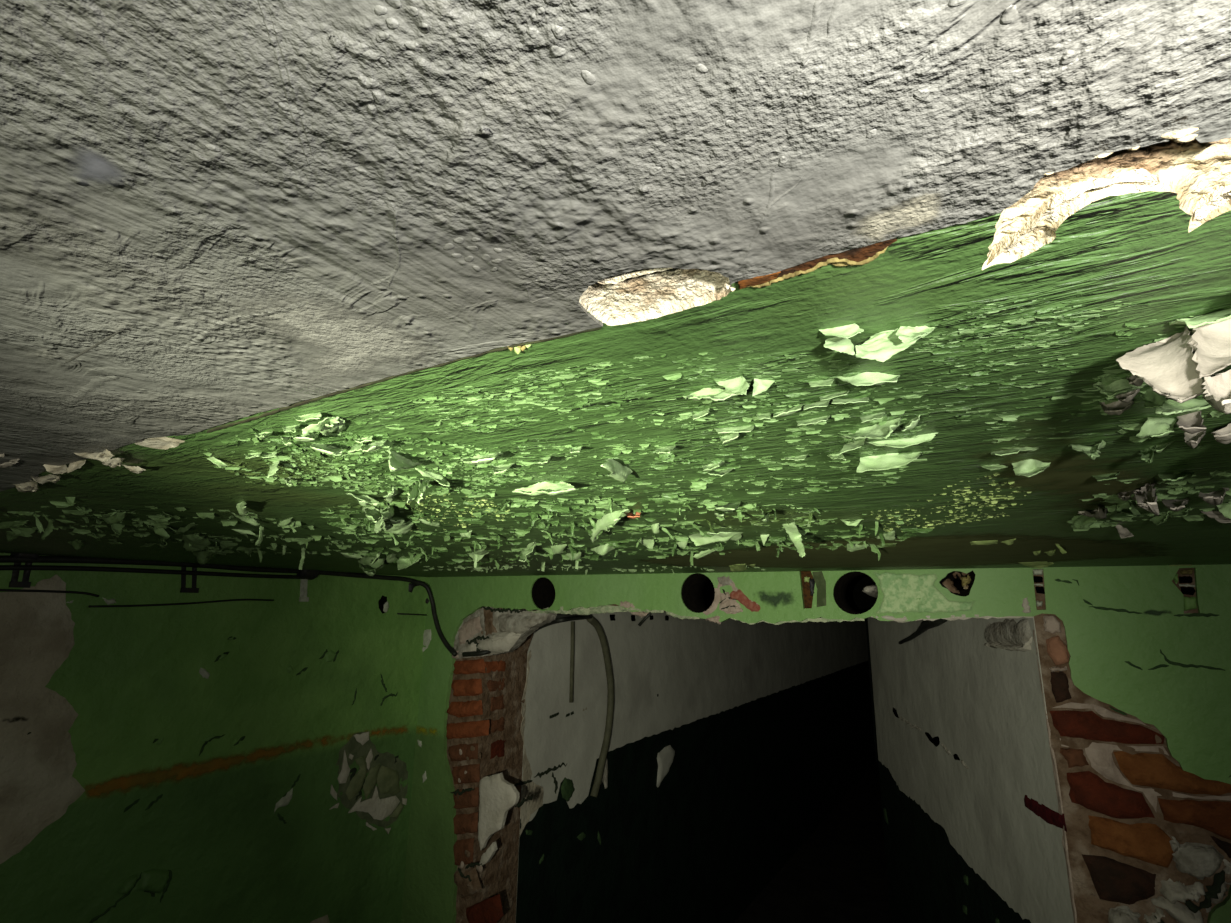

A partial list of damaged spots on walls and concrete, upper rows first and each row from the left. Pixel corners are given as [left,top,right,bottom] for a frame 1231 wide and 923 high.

flaking render [579,267,735,326]
rust [738,238,897,289]
flaking render [982,128,1231,270]
flaking render [0,292,1231,923]